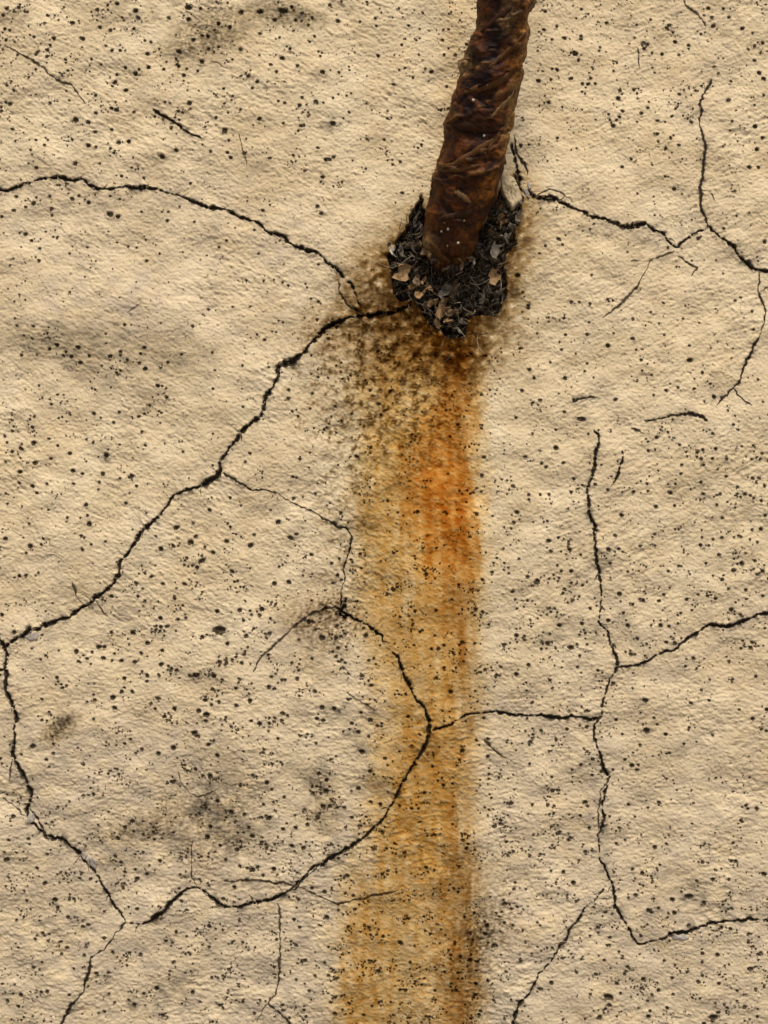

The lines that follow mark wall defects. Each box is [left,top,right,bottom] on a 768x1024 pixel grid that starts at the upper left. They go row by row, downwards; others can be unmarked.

crack [4,45,86,104]
crack [152,109,202,138]
crack [0,175,360,309]
spalling [377,170,525,364]
crack [510,80,768,434]
crack [0,312,768,1024]